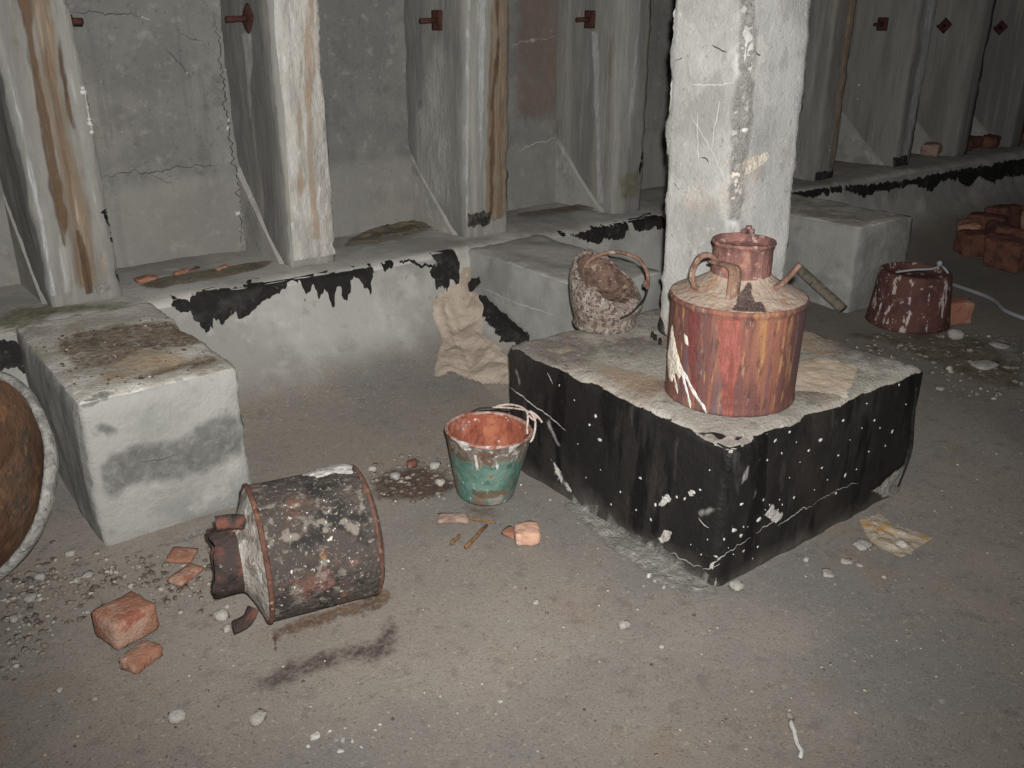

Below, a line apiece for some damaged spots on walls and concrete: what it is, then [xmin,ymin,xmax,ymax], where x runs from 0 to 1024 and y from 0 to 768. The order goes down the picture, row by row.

corrosion [18,0,105,294]
crack [103,15,244,250]
corrosion [486,0,508,219]
spalling [713,0,761,220]
peeling [381,258,437,272]
water stain [104,419,239,491]
crack [671,483,857,570]